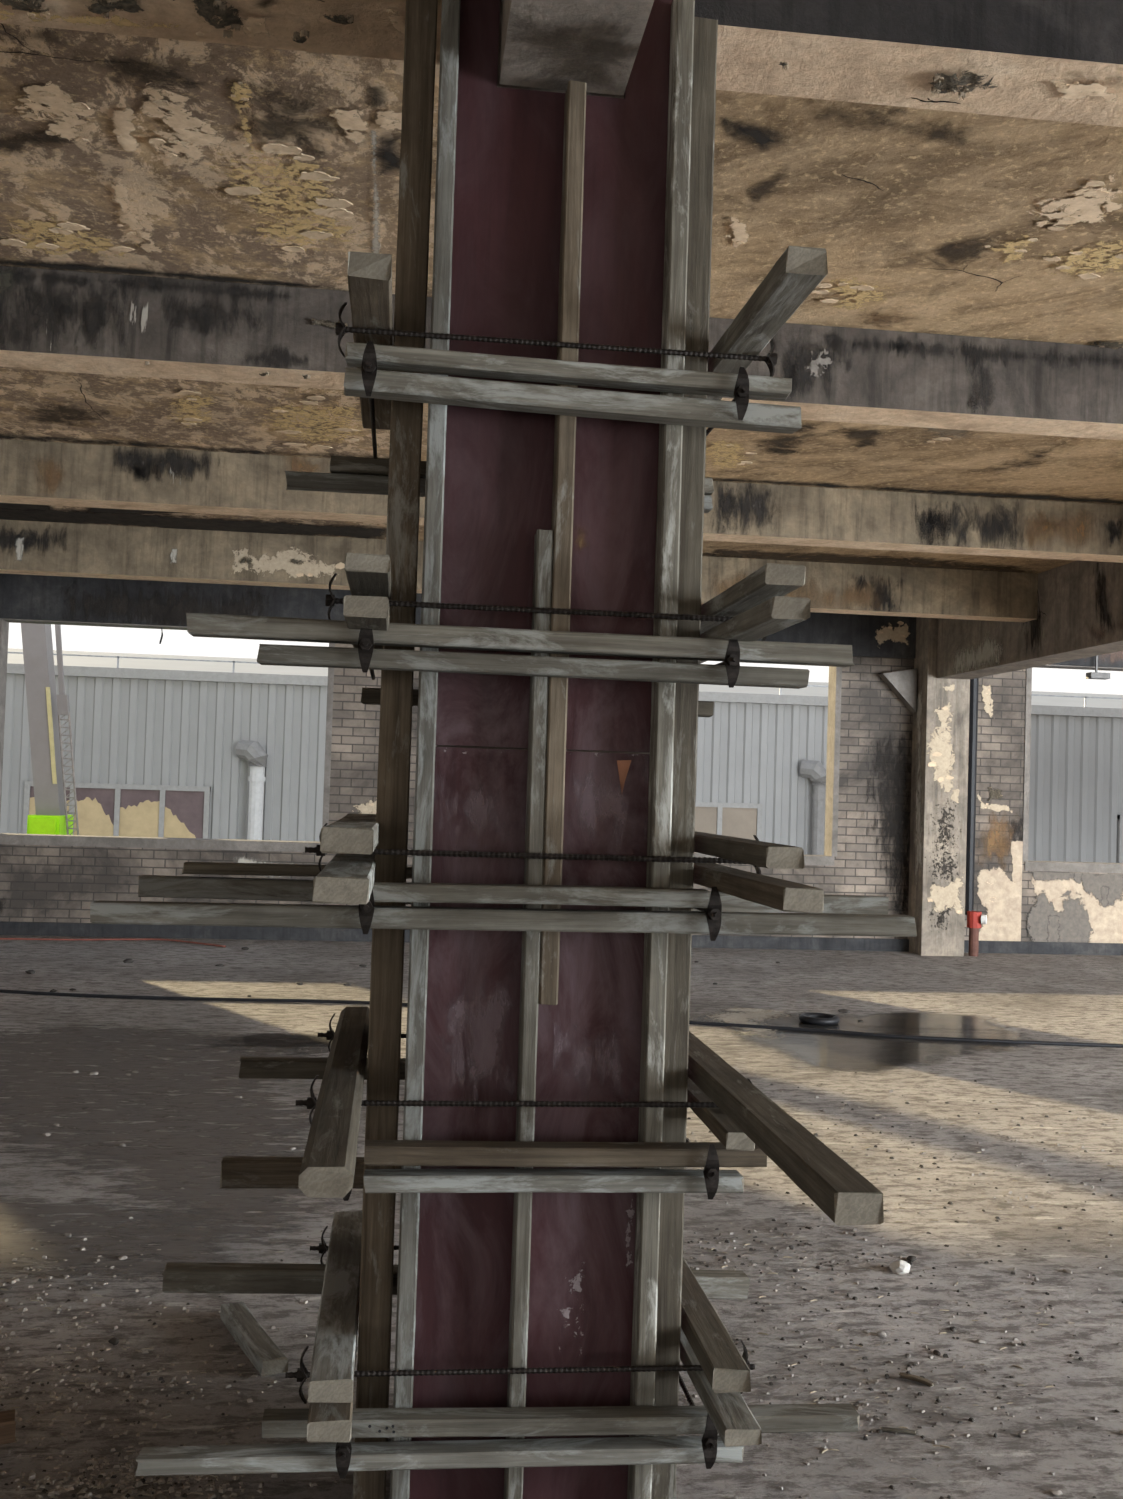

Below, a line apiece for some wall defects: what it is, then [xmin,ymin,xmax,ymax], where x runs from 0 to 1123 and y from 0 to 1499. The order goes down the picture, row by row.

peeling [327,109,402,144]
peeling [0,81,364,258]
peeling [984,174,1123,279]
damp [130,303,148,333]
damp [918,510,959,547]
peeling [232,547,345,581]
peeling [875,621,910,647]
peeling [981,685,993,717]
peeling [927,684,960,803]
peeling [977,787,1013,813]
peeling [927,873,965,914]